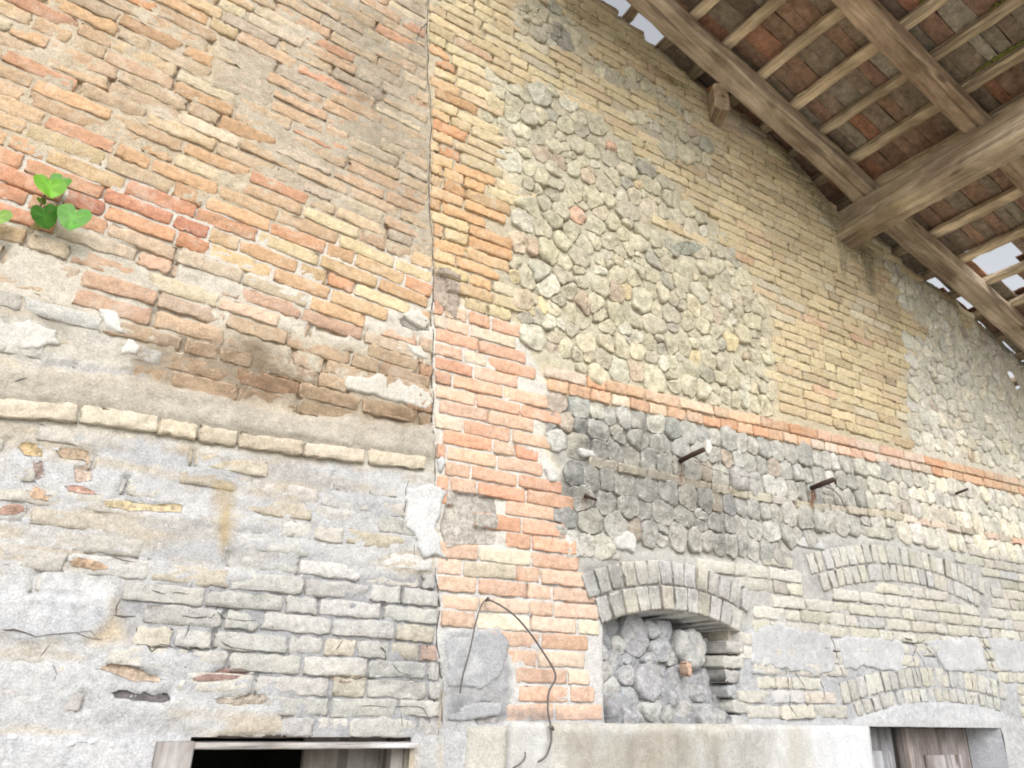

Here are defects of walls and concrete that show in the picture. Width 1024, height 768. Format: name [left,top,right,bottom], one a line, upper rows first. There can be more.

crack [416,0,434,267]
peeling [398,309,430,331]
peeling [405,343,428,359]
peeling [345,373,433,409]
crack [429,301,437,482]
spalling [405,484,499,560]
crack [366,481,443,728]